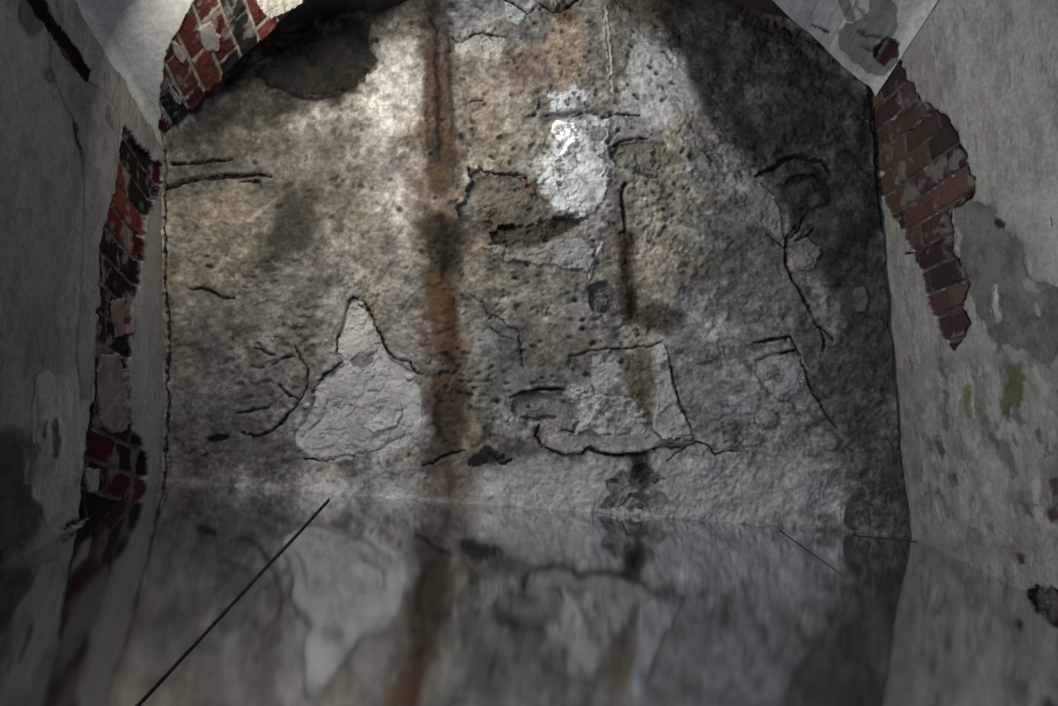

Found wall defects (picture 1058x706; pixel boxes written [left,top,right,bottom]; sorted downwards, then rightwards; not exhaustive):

flaking render [158,0,304,139]
flaking render [25,31,163,535]
crack [163,149,272,481]
crack [236,296,424,462]
spalling [295,300,423,462]
corrosion [425,271,465,448]
flaking render [457,82,673,314]
spalling [512,342,693,515]
crack [533,342,741,461]
corrosion [629,451,650,487]
corrosion [618,230,684,331]
crack [753,217,837,427]